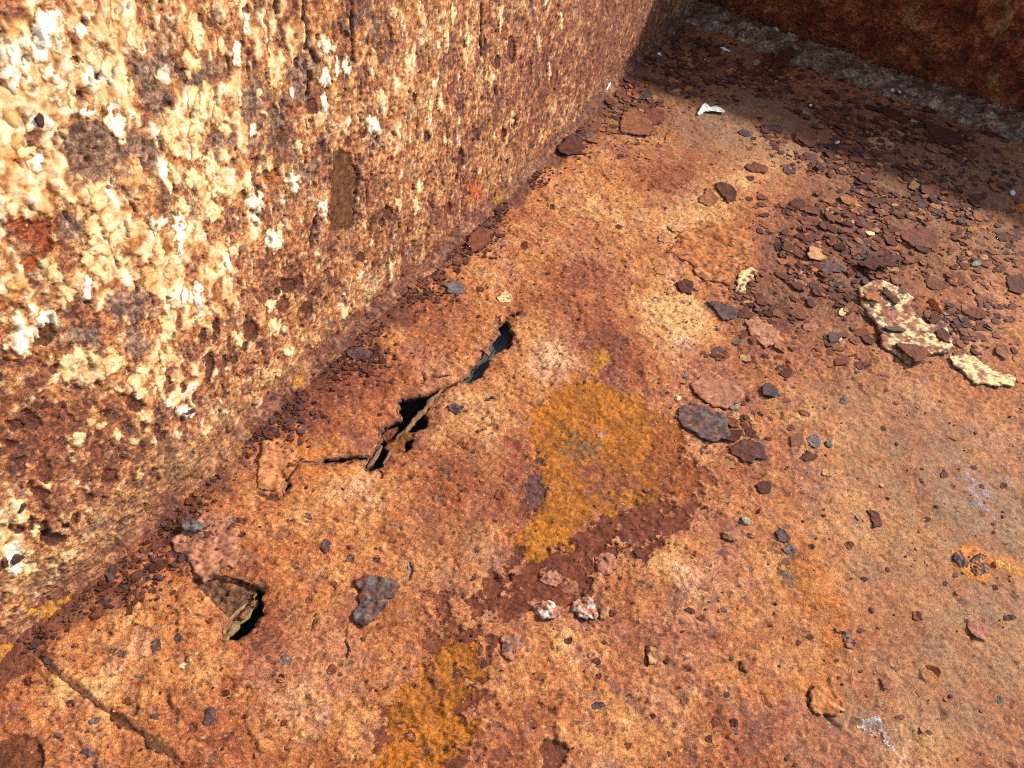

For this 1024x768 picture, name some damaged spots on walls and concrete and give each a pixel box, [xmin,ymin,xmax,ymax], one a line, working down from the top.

rust [744,161,769,181]
rust [667,221,759,295]
rust [775,190,904,307]
rust [859,323,931,363]
rust [925,272,1017,343]
crack [282,311,519,497]
rust [723,400,768,464]
rust [26,591,74,619]
rust [352,555,401,630]
rust [370,348,718,768]
rust [721,523,872,717]
rust [943,539,1024,590]